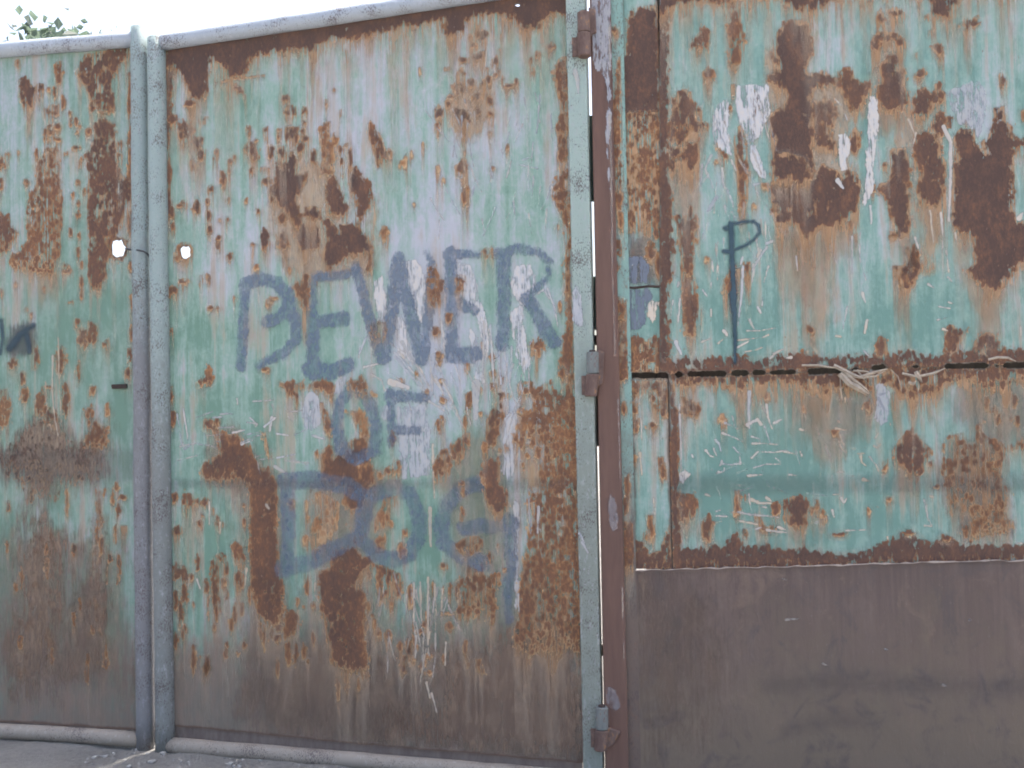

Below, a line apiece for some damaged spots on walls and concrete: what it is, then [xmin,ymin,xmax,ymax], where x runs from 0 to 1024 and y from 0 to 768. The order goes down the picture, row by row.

corrosion [0,318,127,605]
corrosion [0,48,132,304]
corrosion [124,324,132,380]
corrosion [166,0,580,702]
peeling [714,100,732,156]
peeling [750,142,766,179]
corrosion [611,0,1024,574]
peeling [838,133,851,171]